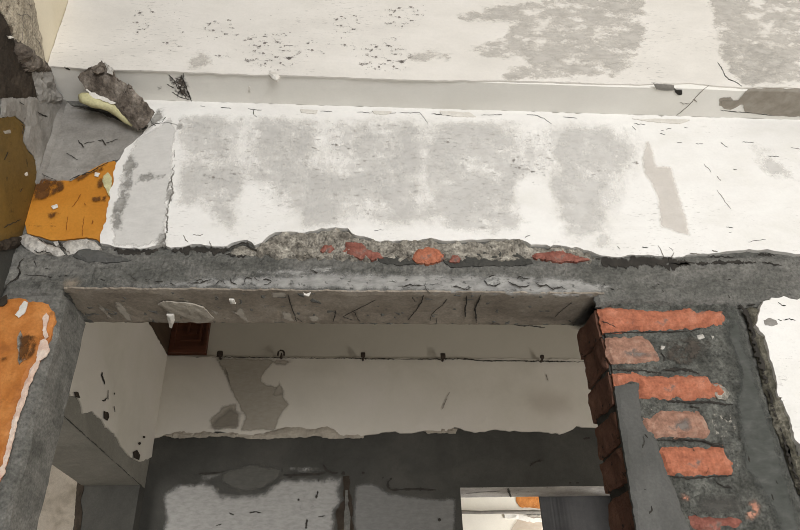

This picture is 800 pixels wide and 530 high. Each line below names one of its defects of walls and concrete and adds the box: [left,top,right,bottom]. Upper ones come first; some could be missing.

crack [677,62,740,115]
peeling [0,116,116,257]
spalling [231,218,595,268]
crack [333,300,375,321]
peeling [0,295,57,482]
spalling [713,384,730,401]